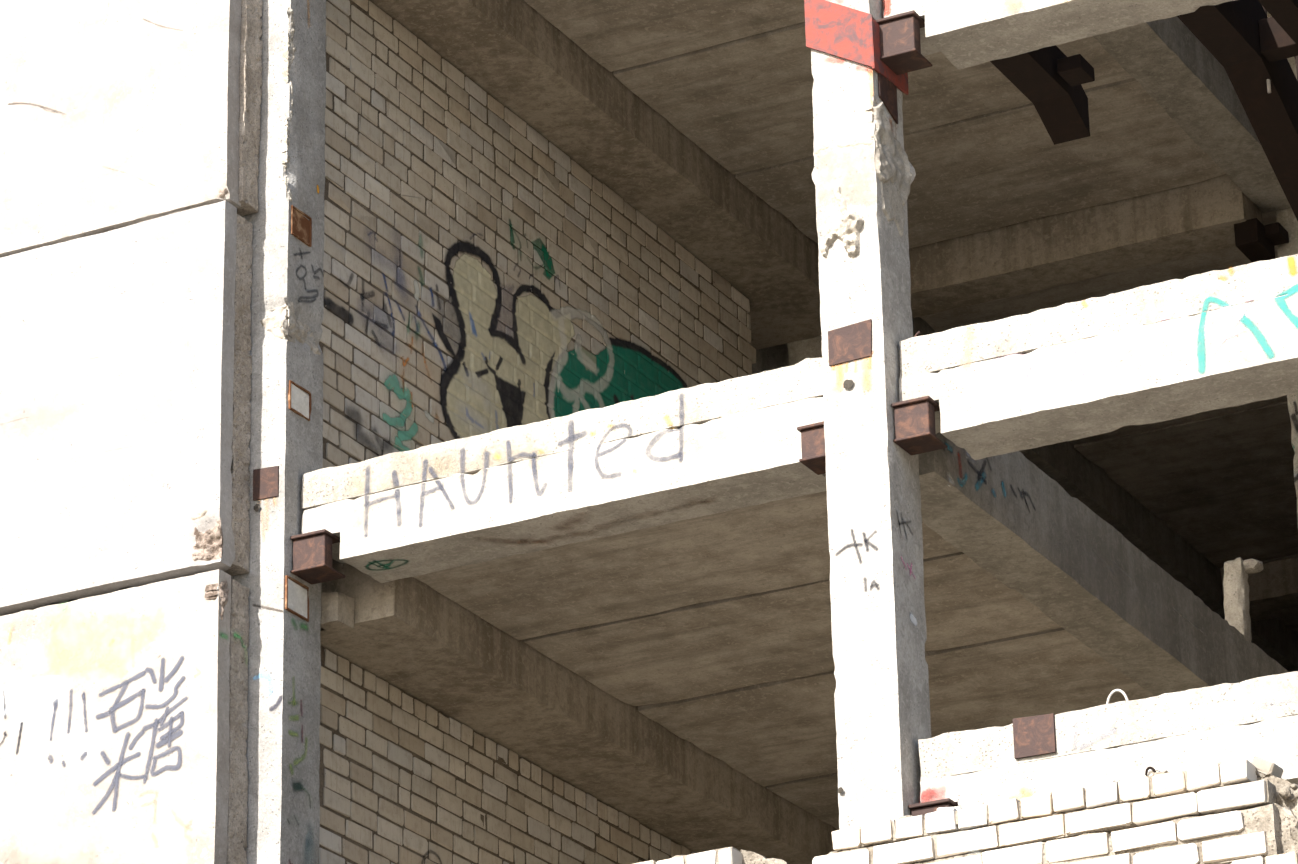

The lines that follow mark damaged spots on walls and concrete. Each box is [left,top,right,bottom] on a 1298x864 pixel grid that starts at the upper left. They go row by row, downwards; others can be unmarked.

spalling [260,297,321,355]